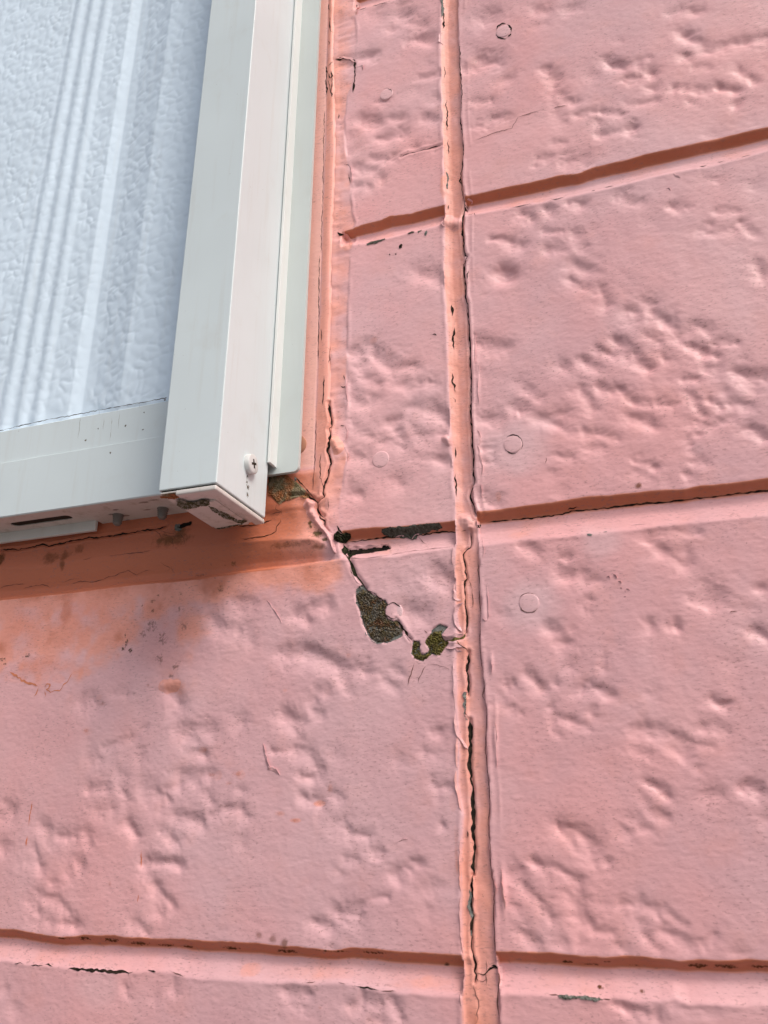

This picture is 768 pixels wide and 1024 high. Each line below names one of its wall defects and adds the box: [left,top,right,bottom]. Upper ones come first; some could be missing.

crack [3,526,173,589]
crack [241,508,282,539]
peeling [349,523,442,558]
crack [342,13,768,1017]
crack [16,962,182,976]